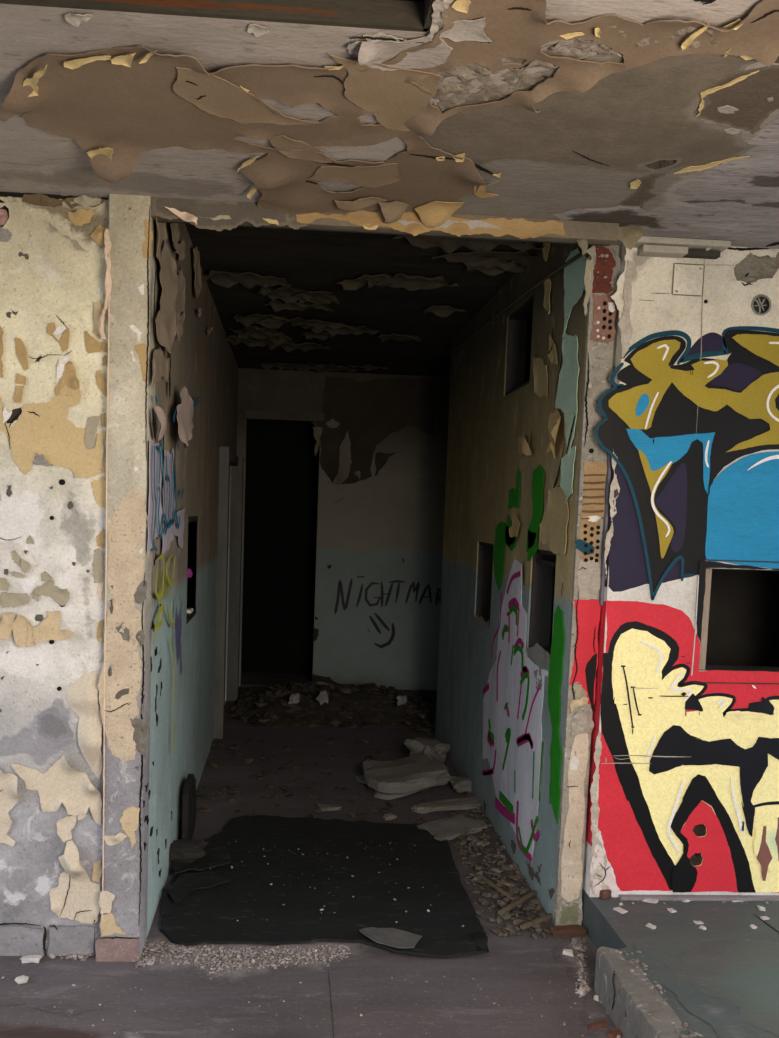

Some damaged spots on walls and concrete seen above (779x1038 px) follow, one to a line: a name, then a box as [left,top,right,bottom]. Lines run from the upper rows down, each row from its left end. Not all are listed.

crack [704,242,779,286]
peeling [0,0,779,600]
crack [697,296,705,361]
peeling [0,194,194,937]
damp [0,994,338,1038]